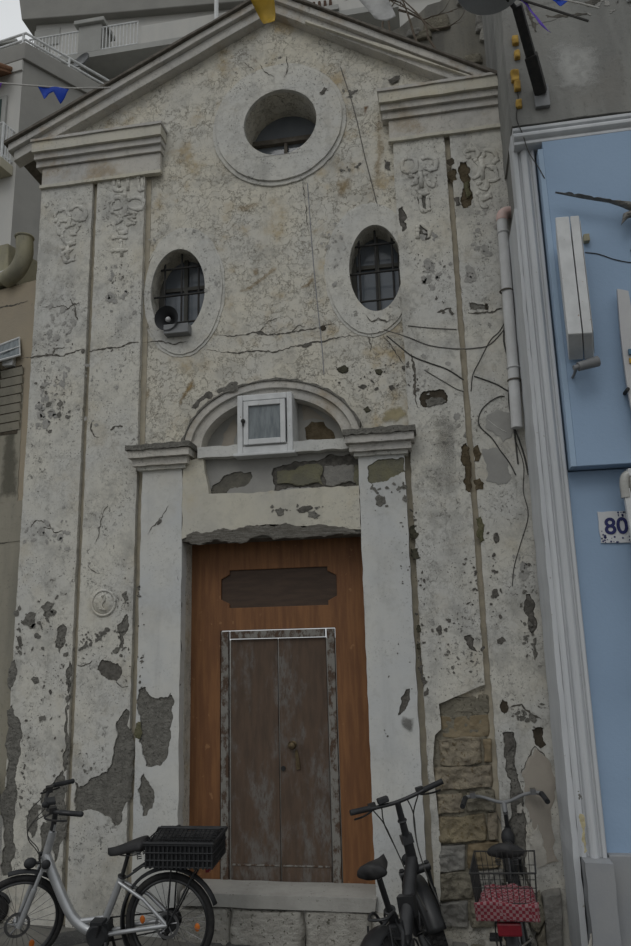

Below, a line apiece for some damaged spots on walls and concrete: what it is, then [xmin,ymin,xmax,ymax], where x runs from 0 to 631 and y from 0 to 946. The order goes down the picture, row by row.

spalling [398,207,407,232]
spalling [446,158,497,283]
peeling [408,225,452,297]
spalling [419,354,461,422]
spalling [211,471,252,494]
spalling [272,454,408,511]
spalling [460,443,484,492]
spalling [0,586,175,876]
flaking render [433,694,559,928]